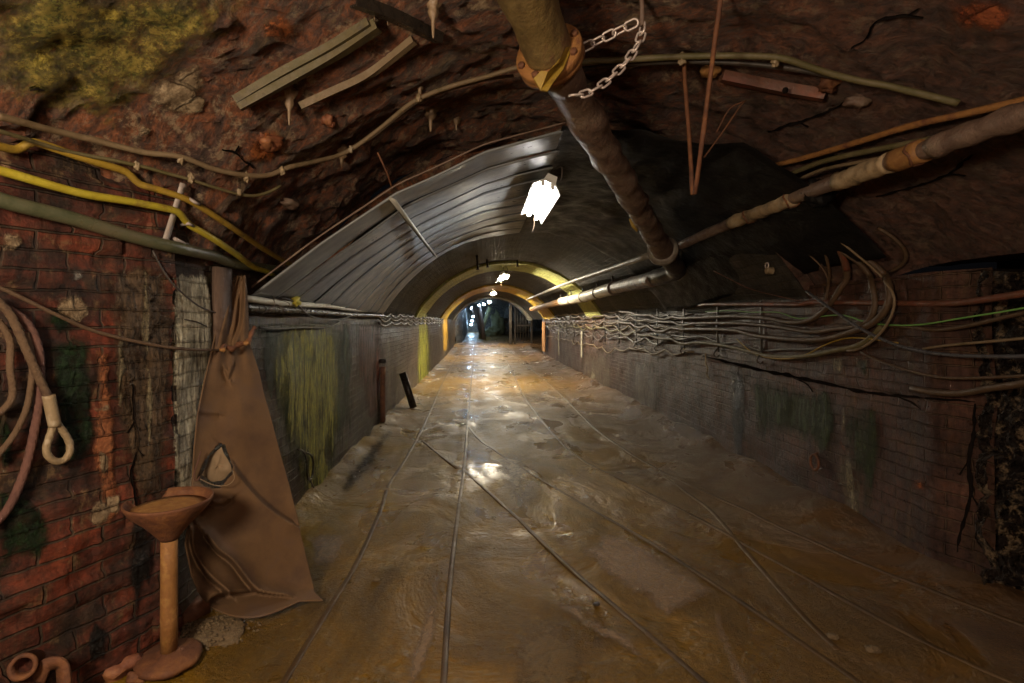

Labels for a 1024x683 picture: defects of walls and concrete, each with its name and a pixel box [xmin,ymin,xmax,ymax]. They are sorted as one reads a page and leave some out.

damp [261,324,351,485]
crack [702,356,981,552]